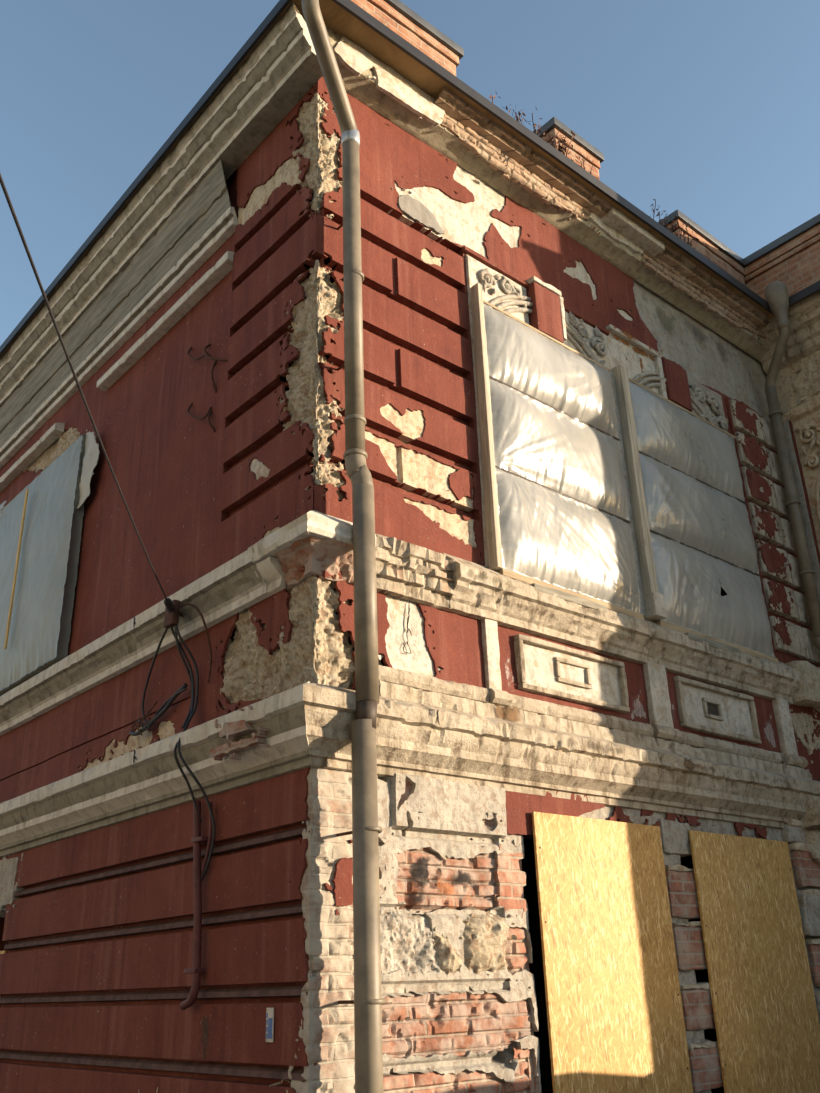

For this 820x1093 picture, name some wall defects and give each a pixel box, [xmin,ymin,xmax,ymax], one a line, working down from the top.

spalling [238,92,342,225]
peeling [387,160,521,267]
flaking render [428,101,771,423]
spalling [279,260,348,500]
peeling [365,404,478,548]
spalling [210,536,355,761]
peeling [378,594,442,677]
flaking render [398,779,412,805]
peeling [790,708,820,764]
flaking render [380,844,528,981]
flaking render [382,990,535,1093]